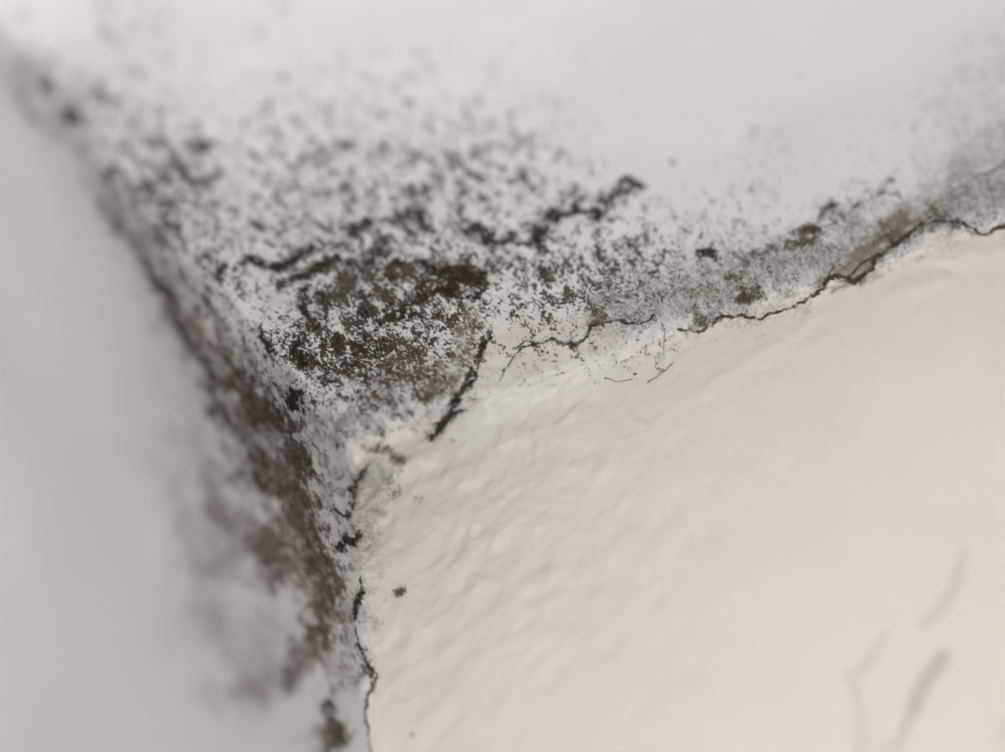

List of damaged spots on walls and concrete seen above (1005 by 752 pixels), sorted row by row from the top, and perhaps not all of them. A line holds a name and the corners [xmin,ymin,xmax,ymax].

leakage [82,92,1005,697]
crack [426,161,1005,438]
leakage [314,698,353,752]
crack [354,575,378,752]